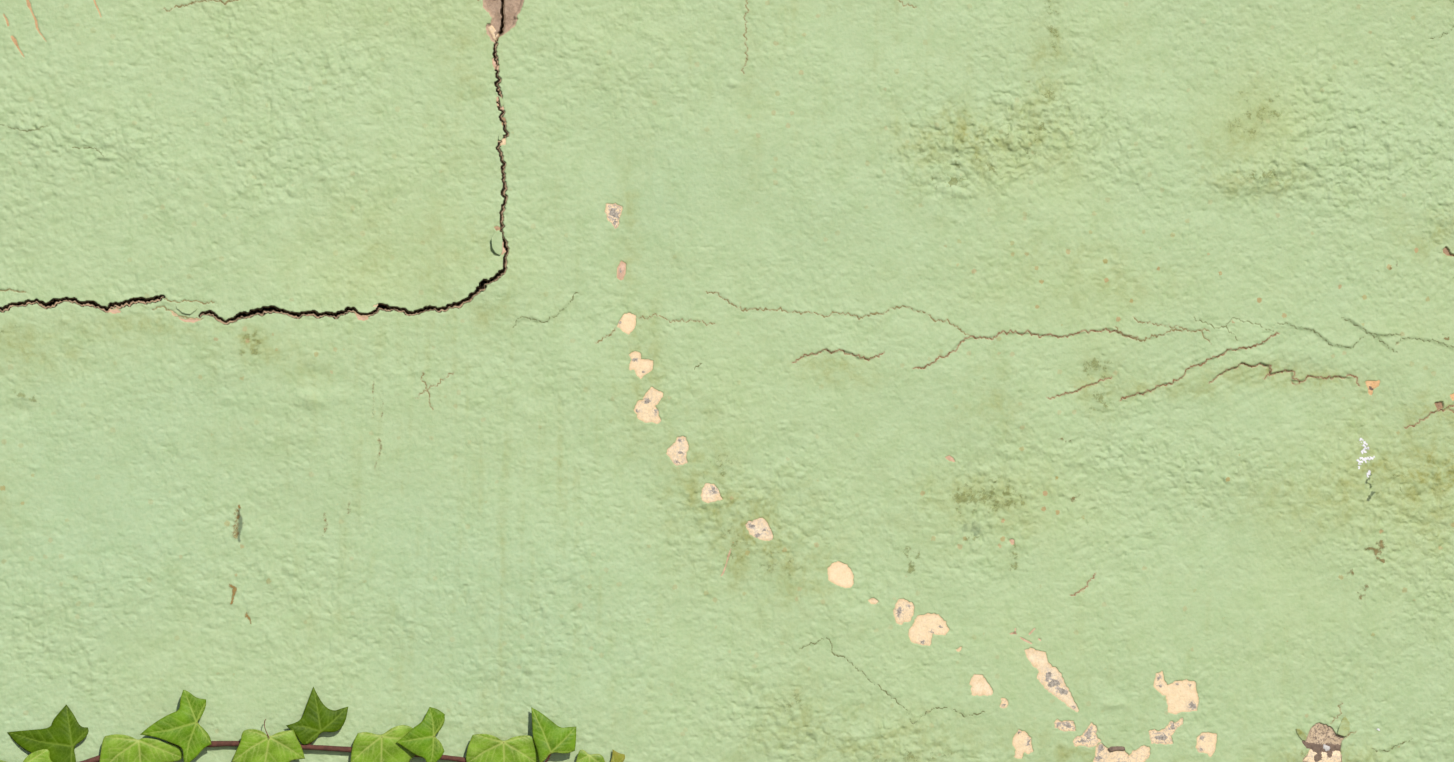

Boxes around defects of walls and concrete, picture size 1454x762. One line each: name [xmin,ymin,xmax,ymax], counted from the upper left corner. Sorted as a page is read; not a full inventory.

crack [741,0,749,74]
crack [0,0,509,324]
crack [513,292,578,328]
peeling [617,313,663,424]
crack [596,291,1454,401]
crack [1404,405,1454,429]
peeling [746,518,773,541]
peeling [827,561,854,588]
peeling [868,598,949,646]
peeling [1025,647,1199,762]
peeling [1012,730,1033,759]
peeling [1296,717,1350,762]